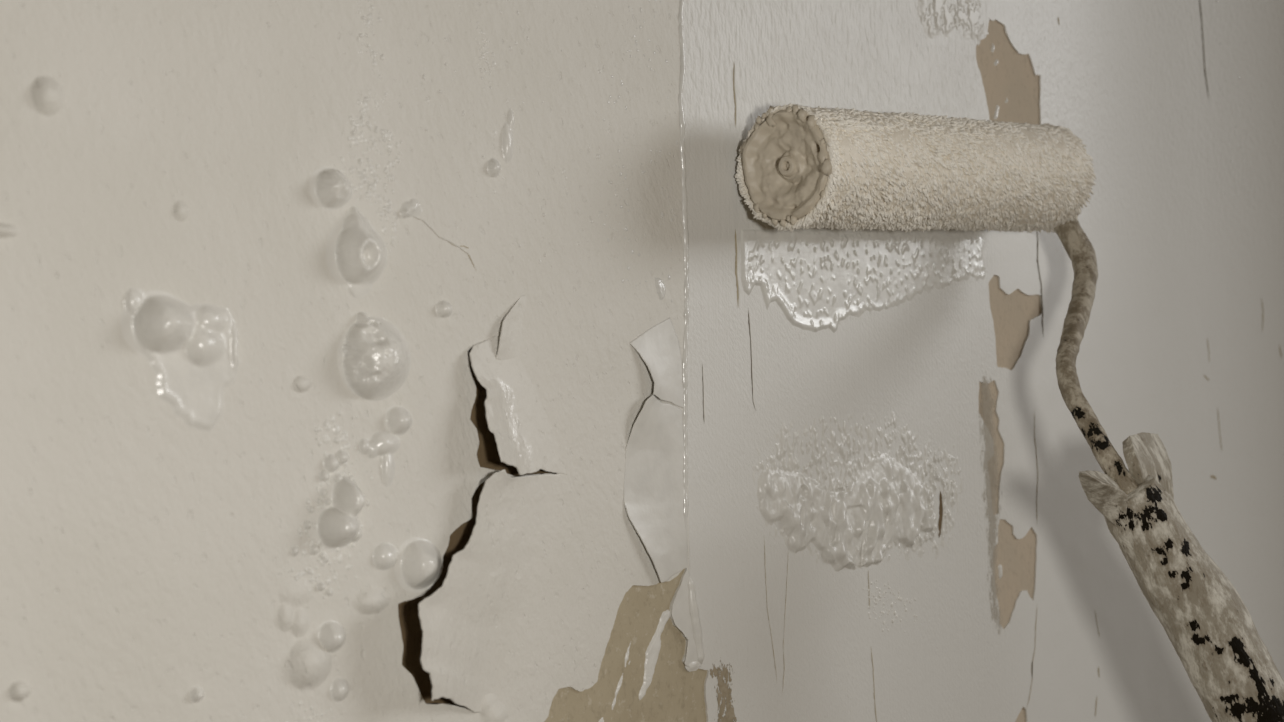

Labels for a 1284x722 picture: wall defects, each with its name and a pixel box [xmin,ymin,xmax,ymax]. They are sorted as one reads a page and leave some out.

peeling [398,295,567,713]
peeling [544,317,709,722]
peeling [979,275,1042,629]
peeling [1015,707,1027,722]